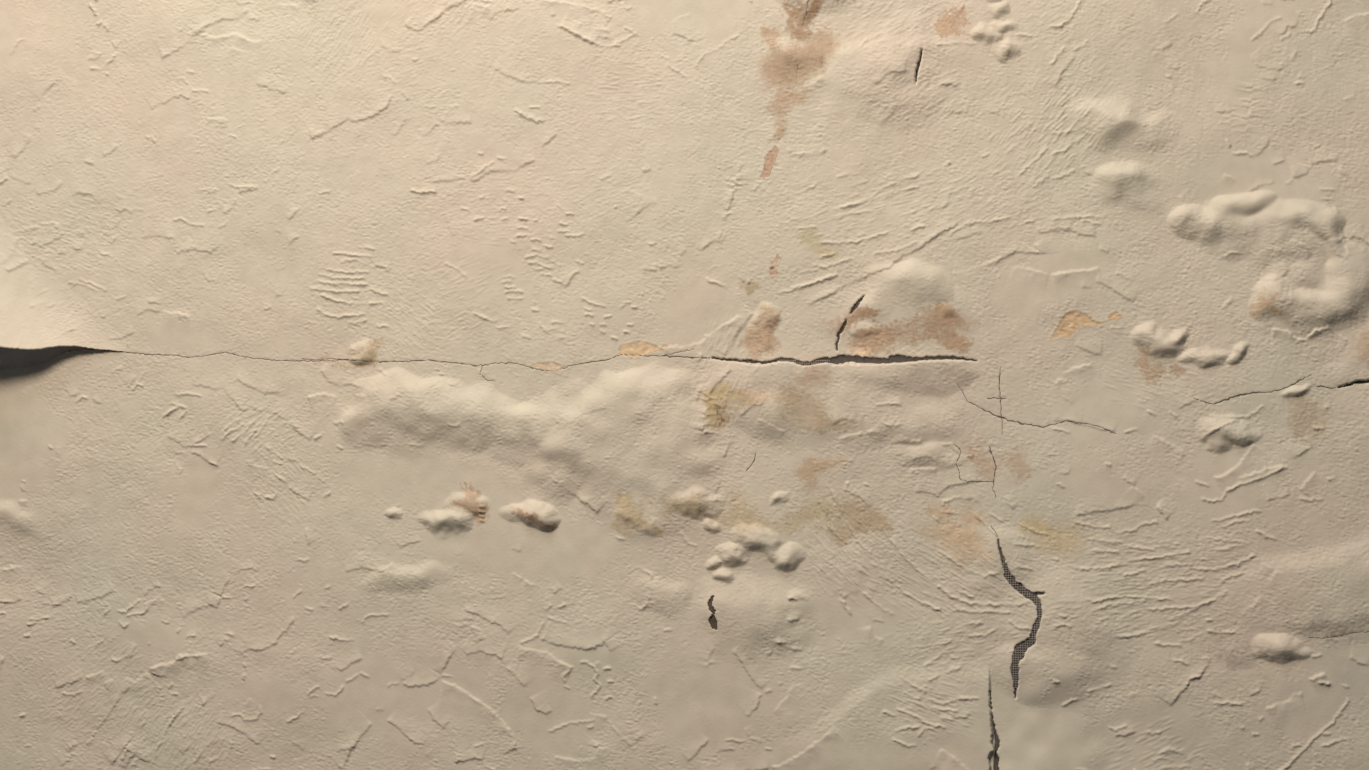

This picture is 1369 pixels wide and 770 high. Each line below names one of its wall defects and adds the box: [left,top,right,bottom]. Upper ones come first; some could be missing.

flaking render [0,216,128,370]
crack [1194,375,1369,404]
crack [126,296,1116,770]